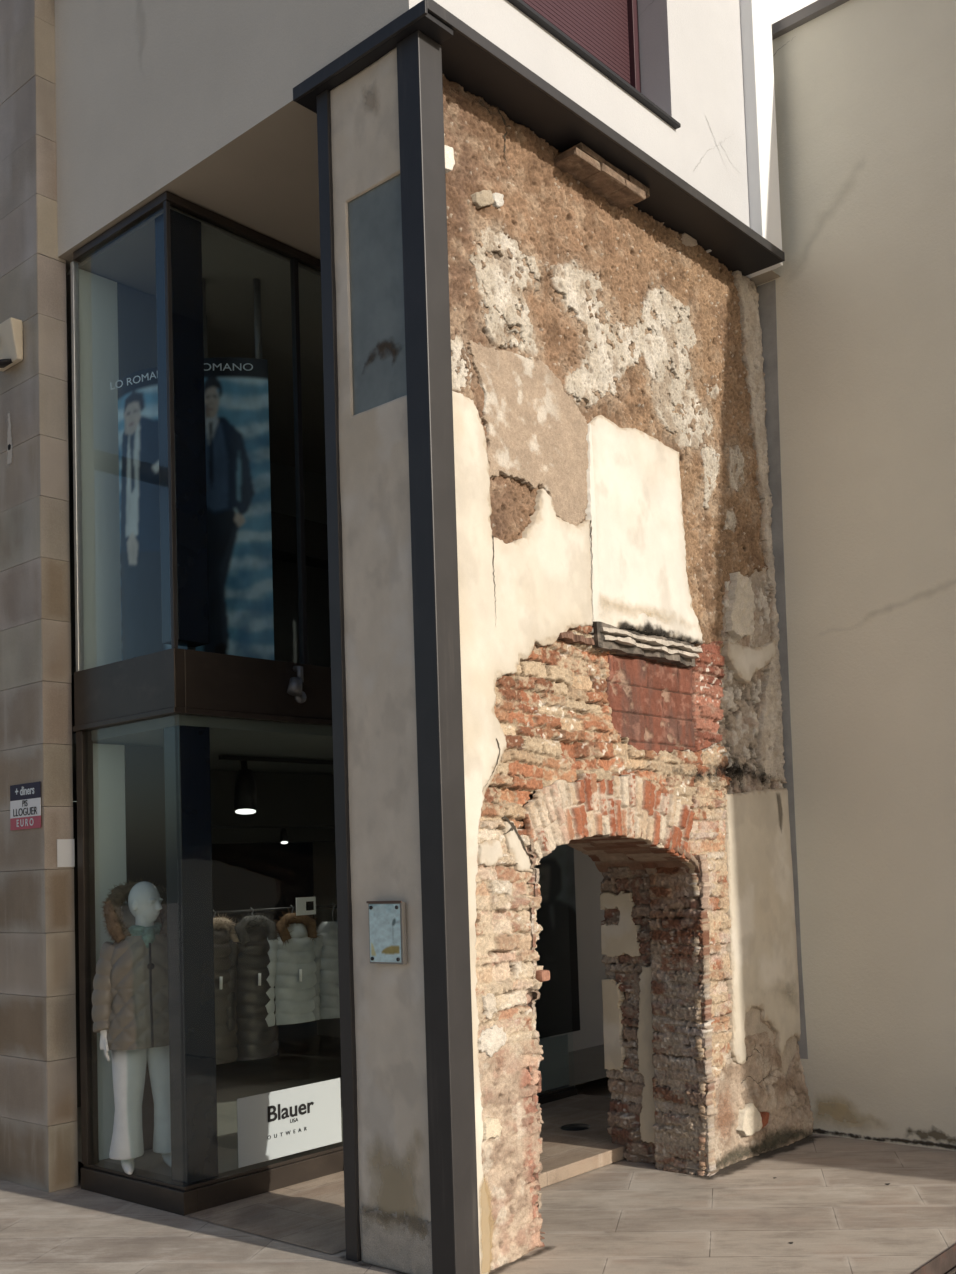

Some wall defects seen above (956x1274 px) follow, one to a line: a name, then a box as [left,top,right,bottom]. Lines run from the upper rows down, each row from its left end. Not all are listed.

spalling [442,74,768,668]
spalling [480,625,732,836]
spalling [713,1007,814,1169]